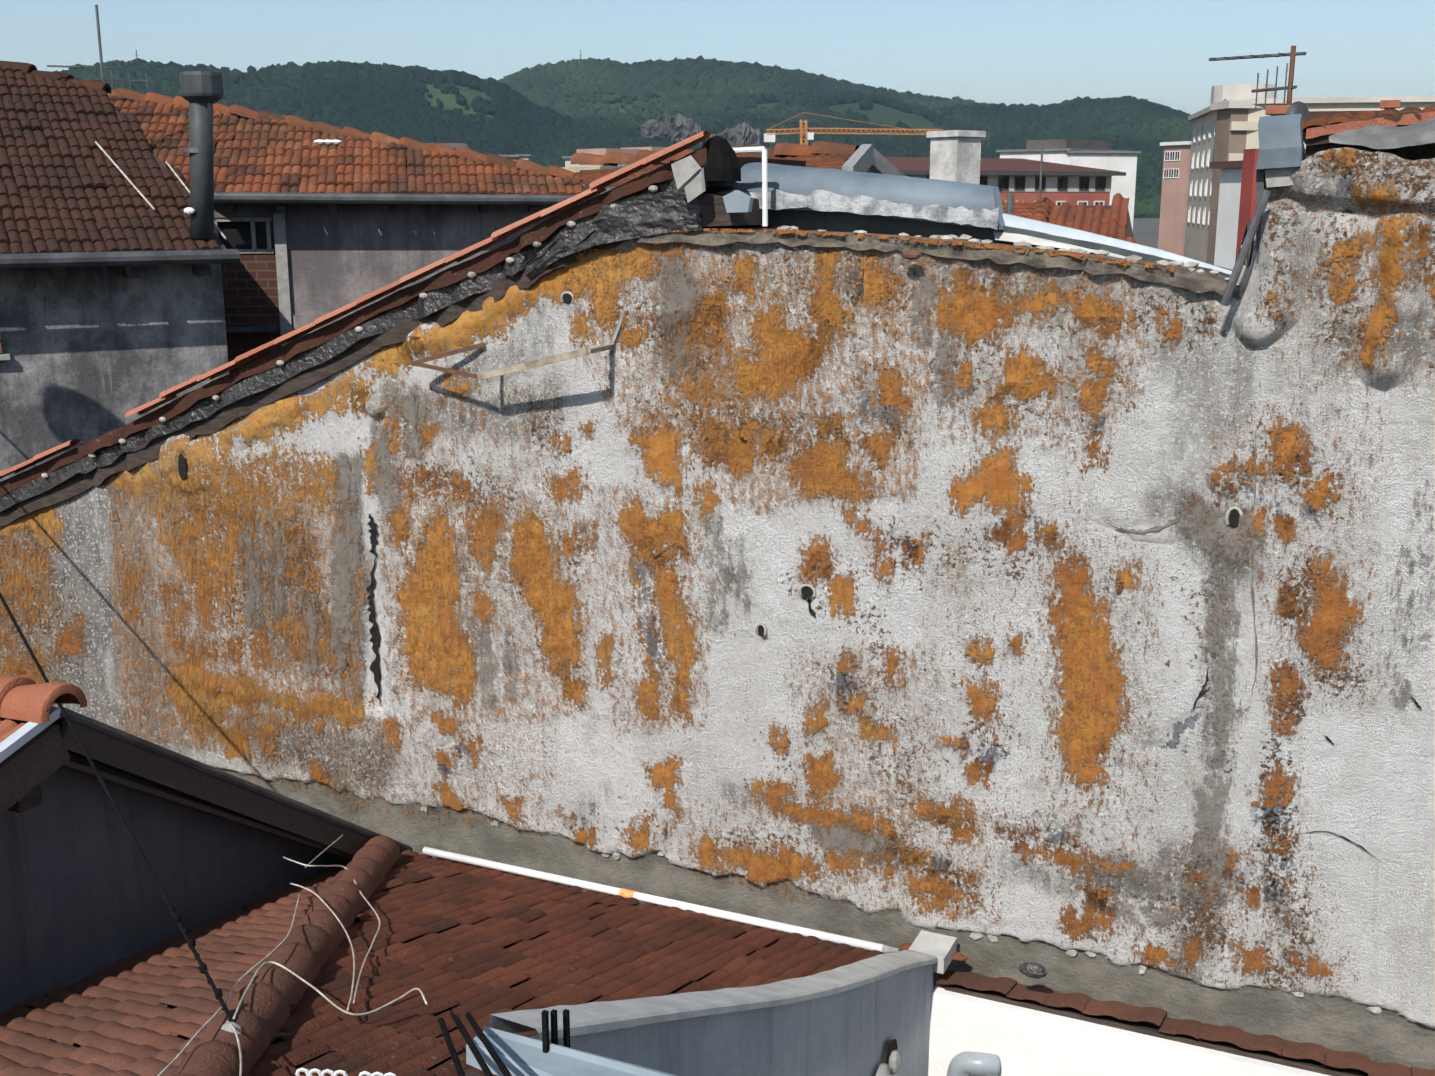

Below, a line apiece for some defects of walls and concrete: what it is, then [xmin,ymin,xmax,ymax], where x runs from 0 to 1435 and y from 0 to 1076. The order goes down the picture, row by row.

leakage [0,505,89,684]
crack [366,514,381,706]
leakage [99,147,1435,1000]
crack [1161,665,1211,748]